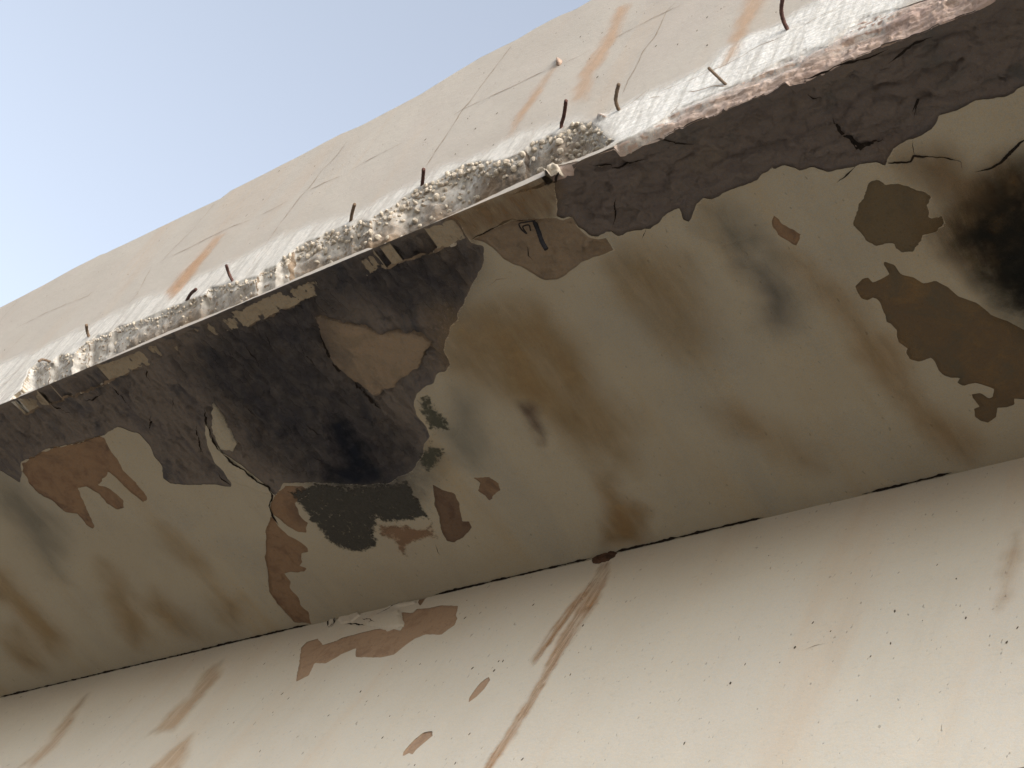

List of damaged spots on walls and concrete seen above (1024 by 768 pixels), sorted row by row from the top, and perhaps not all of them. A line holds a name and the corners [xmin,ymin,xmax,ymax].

crack [886,140,1024,172]
spalling [0,0,1024,533]
water stain [928,163,1024,314]
peeling [433,485,472,542]
peeling [265,517,311,625]
peeling [293,599,467,681]